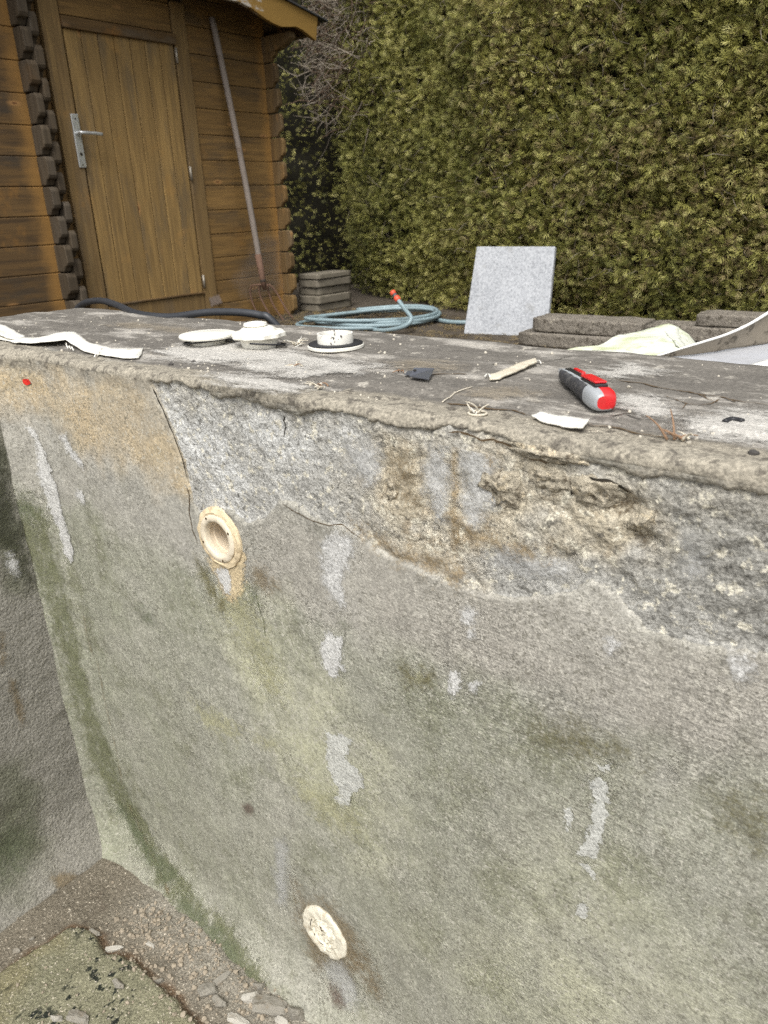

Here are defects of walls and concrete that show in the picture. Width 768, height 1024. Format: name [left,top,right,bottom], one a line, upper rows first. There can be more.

damp [0,427,259,982]
crack [149,383,197,541]
rust [202,552,265,609]
damp [319,631,346,678]
damp [319,531,354,607]
spalling [152,381,768,654]